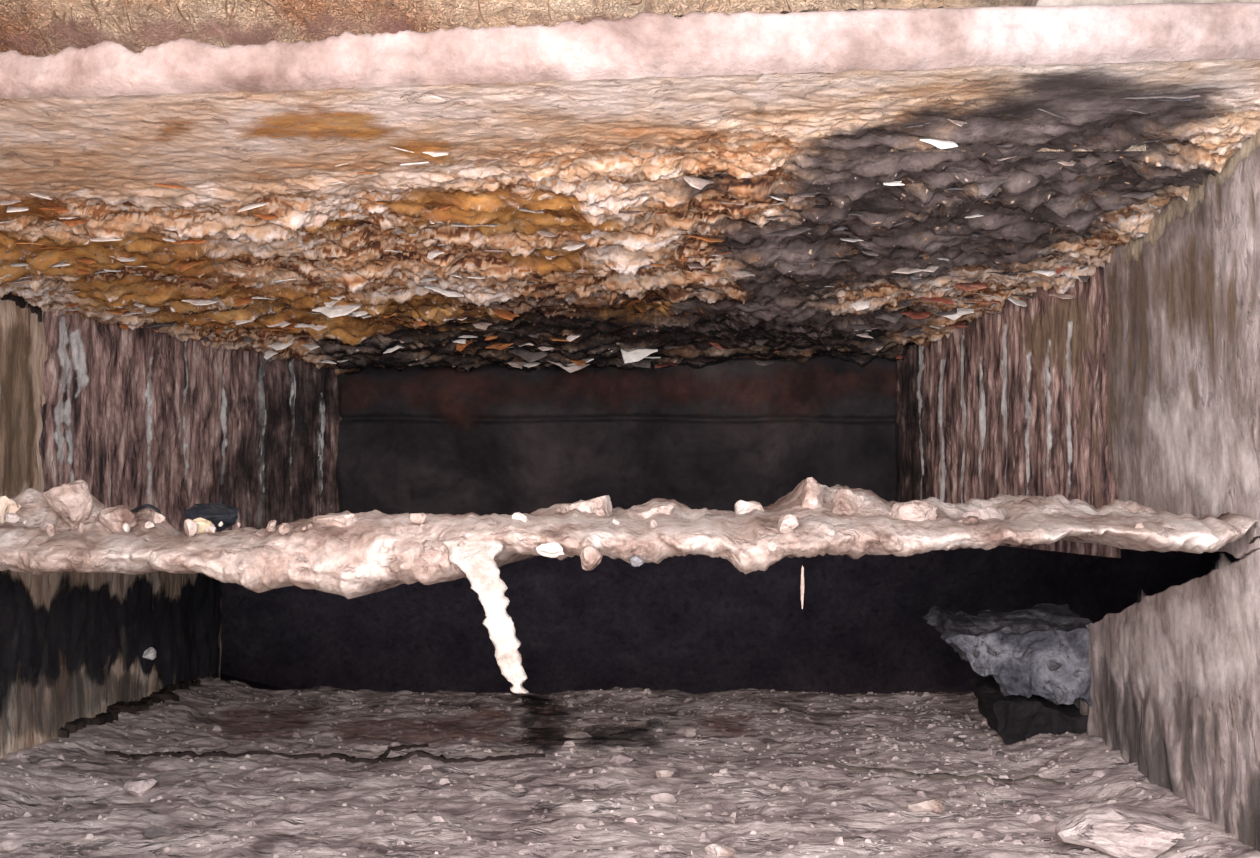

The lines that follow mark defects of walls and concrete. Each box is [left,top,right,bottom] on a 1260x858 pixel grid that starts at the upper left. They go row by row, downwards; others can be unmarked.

crack [35,0,324,53]
crack [596,0,745,17]
crack [780,0,890,14]
damp [55,317,88,482]
peeling [182,268,397,364]
peeling [442,302,594,373]
peeling [621,346,680,368]
damp [1106,235,1260,516]
damp [317,403,326,511]
spalling [220,542,1243,695]
crack [58,680,545,763]
damp [1099,564,1260,793]